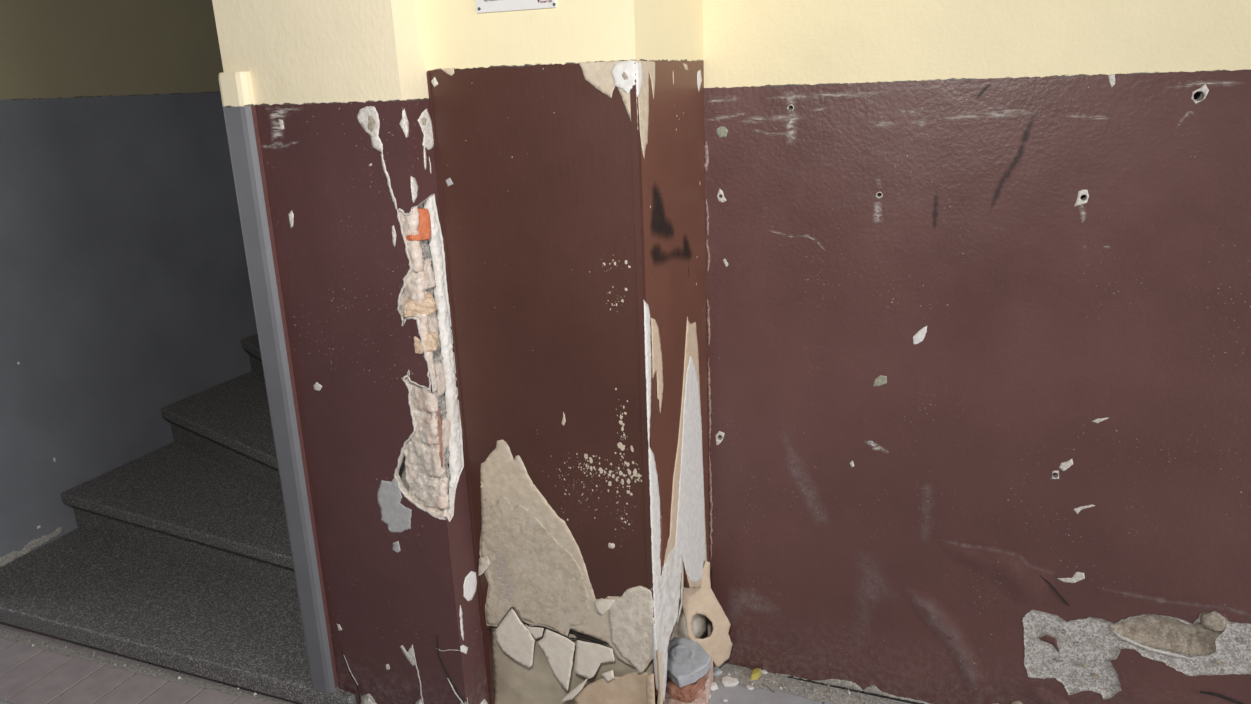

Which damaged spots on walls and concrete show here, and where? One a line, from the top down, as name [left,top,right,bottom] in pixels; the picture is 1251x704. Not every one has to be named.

spalling [1074,190,1089,206]
flaking render [357,106,464,553]
peeling [644,301,663,645]
peeling [707,299,725,556]
flaking render [361,694,377,704]
peeling [495,609,615,691]
flaking render [1022,610,1251,701]